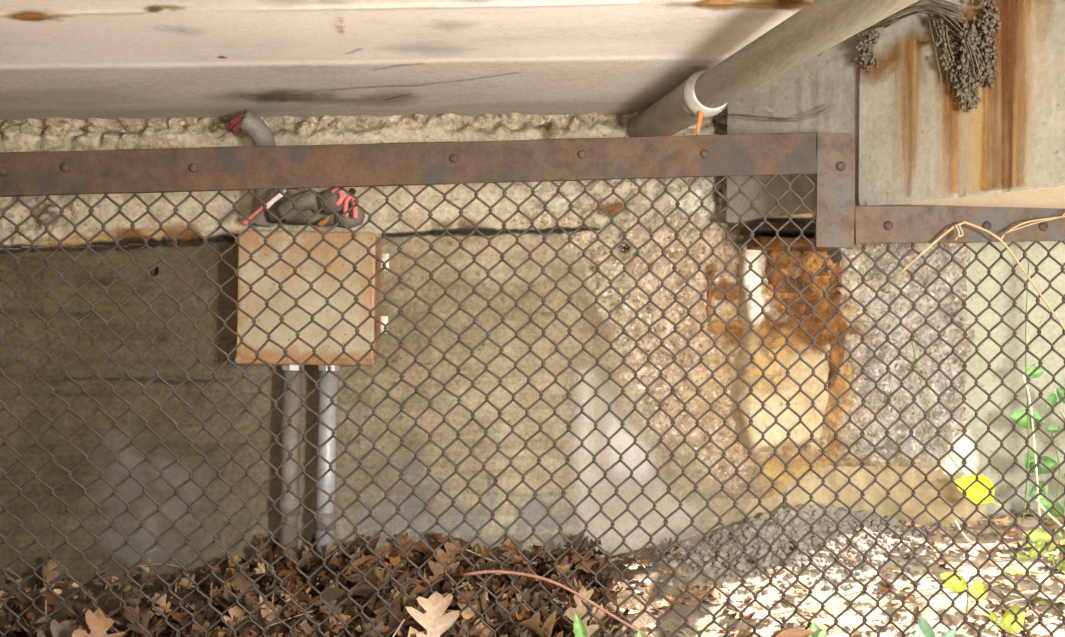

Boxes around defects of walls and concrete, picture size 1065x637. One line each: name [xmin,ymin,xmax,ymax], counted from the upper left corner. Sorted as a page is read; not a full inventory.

rust [11,12,57,21]
rust [698,0,812,10]
rust [900,35,919,192]
rust [943,0,1034,192]
rust [705,265,737,302]
rust [710,250,860,456]